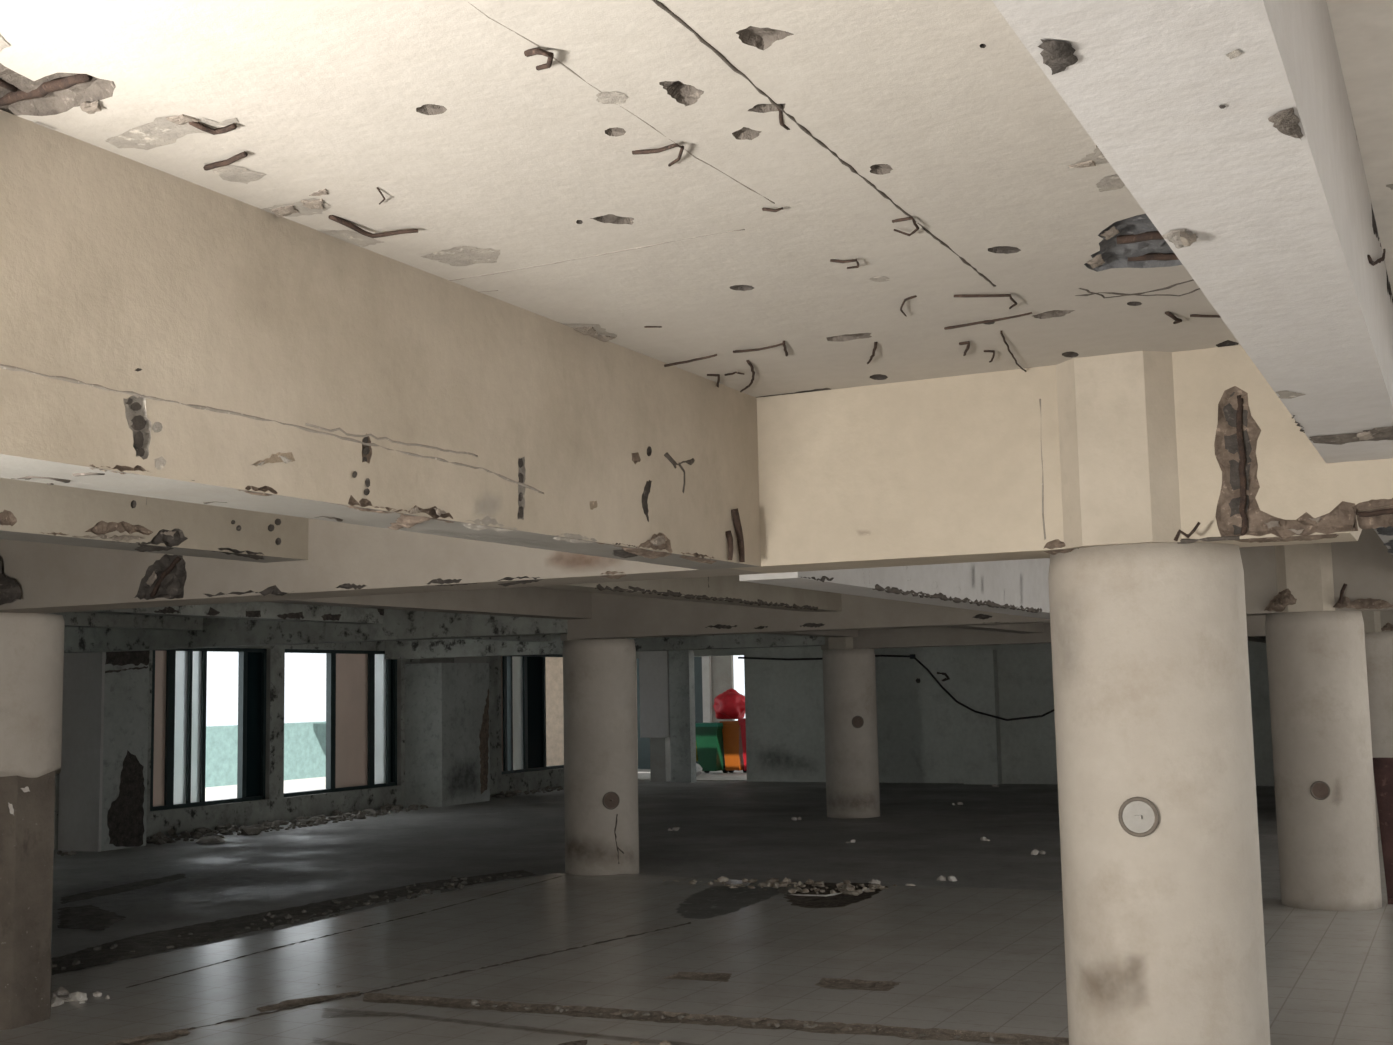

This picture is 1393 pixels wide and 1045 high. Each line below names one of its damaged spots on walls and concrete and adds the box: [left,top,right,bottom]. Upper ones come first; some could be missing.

spalling [0,36,115,130]
peeling [105,114,238,150]
spalling [659,81,704,107]
spalling [736,26,794,50]
spalling [1038,39,1078,75]
spalling [1084,214,1199,272]
crack [1075,280,1200,298]
spalling [90,395,167,475]
crack [0,364,544,494]
spalling [1174,386,1393,554]
spalling [40,521,188,614]
spalling [107,750,145,847]